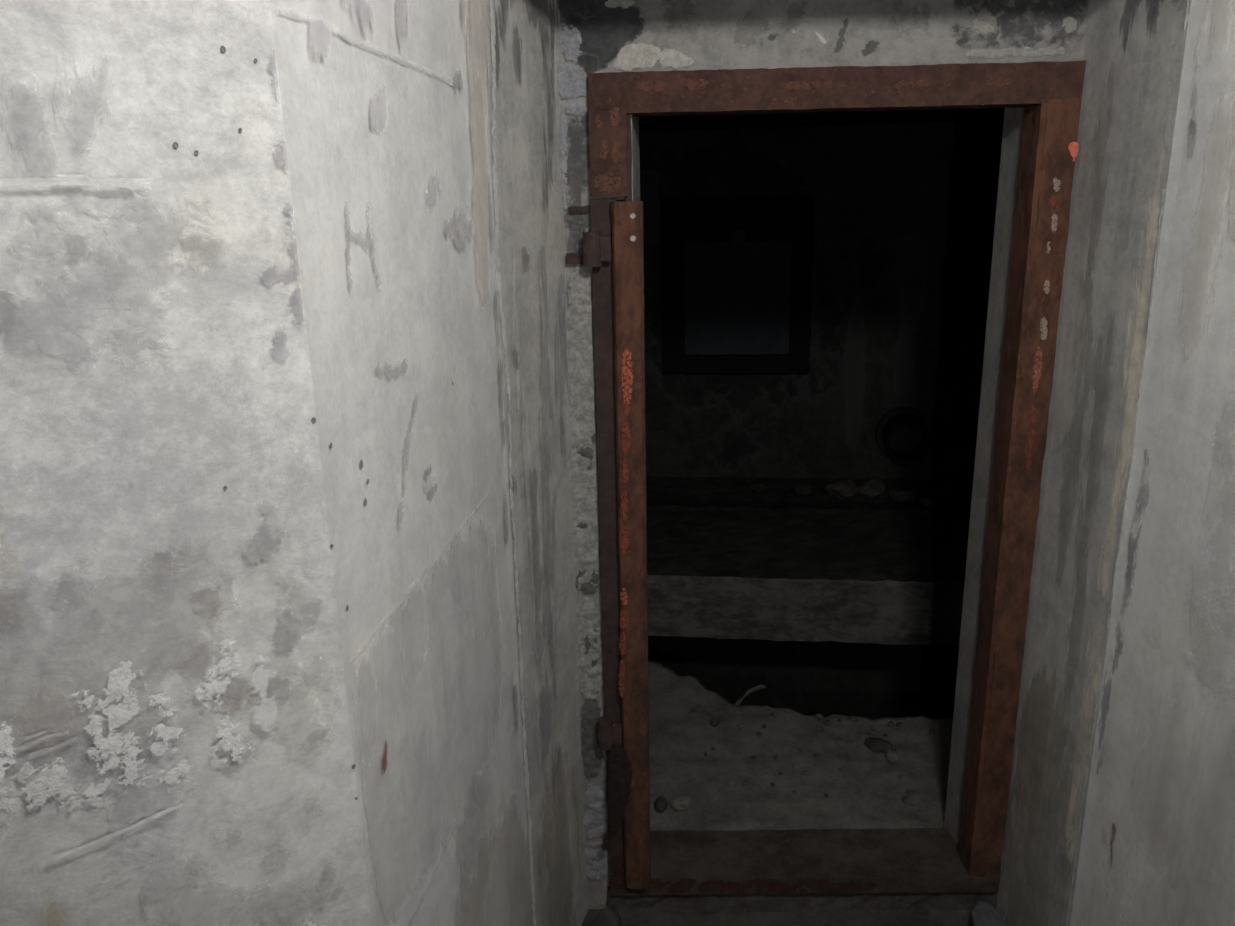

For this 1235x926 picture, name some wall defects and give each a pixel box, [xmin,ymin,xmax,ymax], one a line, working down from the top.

peeling [0,660,190,826]
peeling [196,637,277,764]
rust [601,744,632,851]
water stain [1140,396,1235,926]